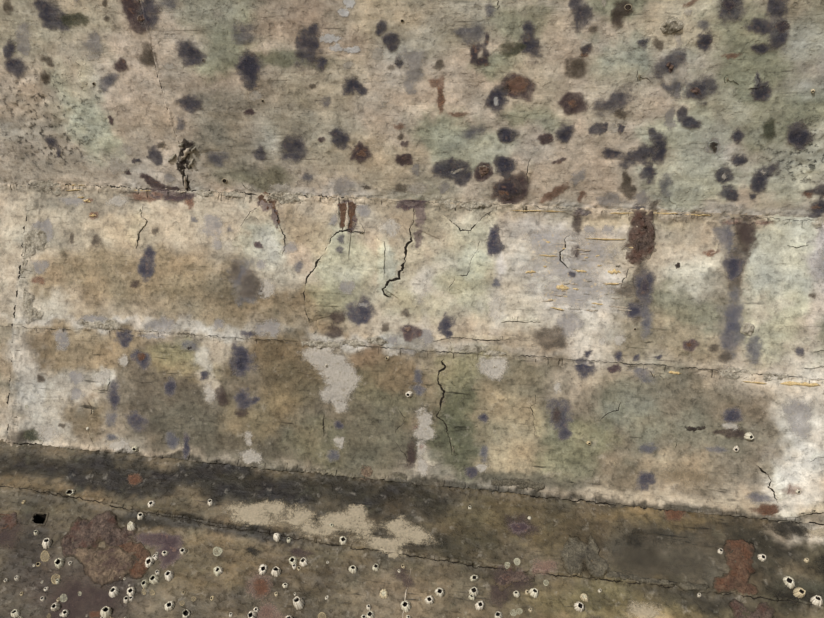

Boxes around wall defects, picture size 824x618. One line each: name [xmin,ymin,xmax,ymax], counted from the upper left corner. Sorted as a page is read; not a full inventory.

water stain [34,0,88,31]
water stain [719,0,790,54]
water stain [637,38,718,129]
water stain [432,157,472,186]
water stain [601,128,670,210]
water stain [715,154,748,201]
crack [303,207,500,334]
rust [621,209,657,266]
water stain [709,224,761,364]
crack [433,316,540,455]
rust [48,511,183,618]
rust [713,539,776,618]